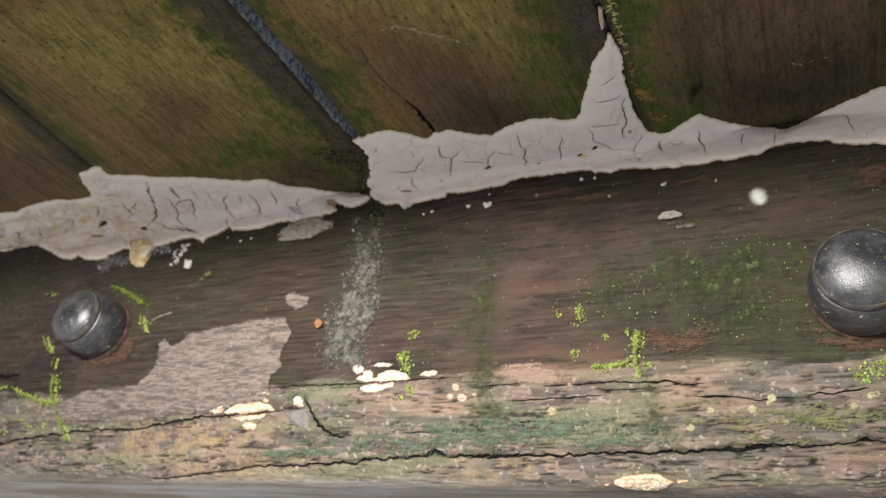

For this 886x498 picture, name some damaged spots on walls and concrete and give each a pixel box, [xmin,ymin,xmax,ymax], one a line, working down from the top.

crack [357,42,532,190]
crack [589,76,706,152]
peeling [285,292,310,310]
water stain [315,214,389,377]
peeling [20,317,292,426]
crack [0,377,461,445]
crack [488,379,868,423]
crack [155,430,886,480]